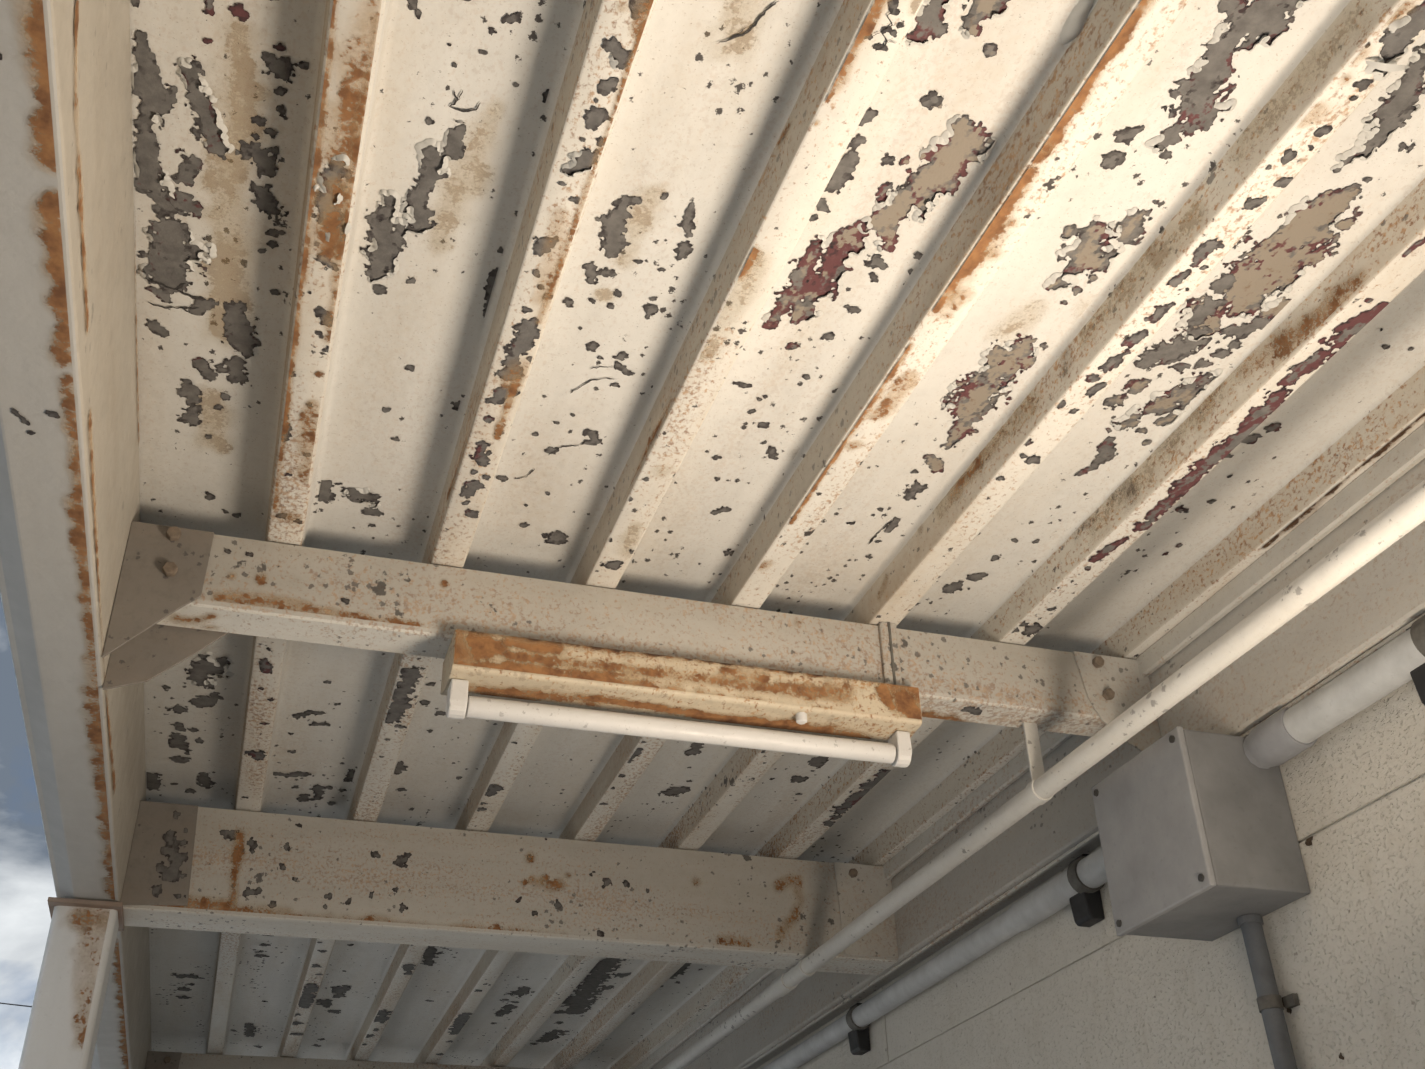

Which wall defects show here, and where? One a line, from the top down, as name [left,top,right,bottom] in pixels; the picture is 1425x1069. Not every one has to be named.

rust [22,0,56,173]
peeling [131,30,309,439]
rust [273,0,380,521]
peeling [459,195,696,518]
rust [789,344,919,525]
peeling [762,91,997,330]
peeling [903,333,1048,501]
rust [932,0,1152,318]
peeling [1042,0,1425,476]
peeling [1084,299,1391,571]
rust [36,190,129,1069]
rust [454,629,964,739]